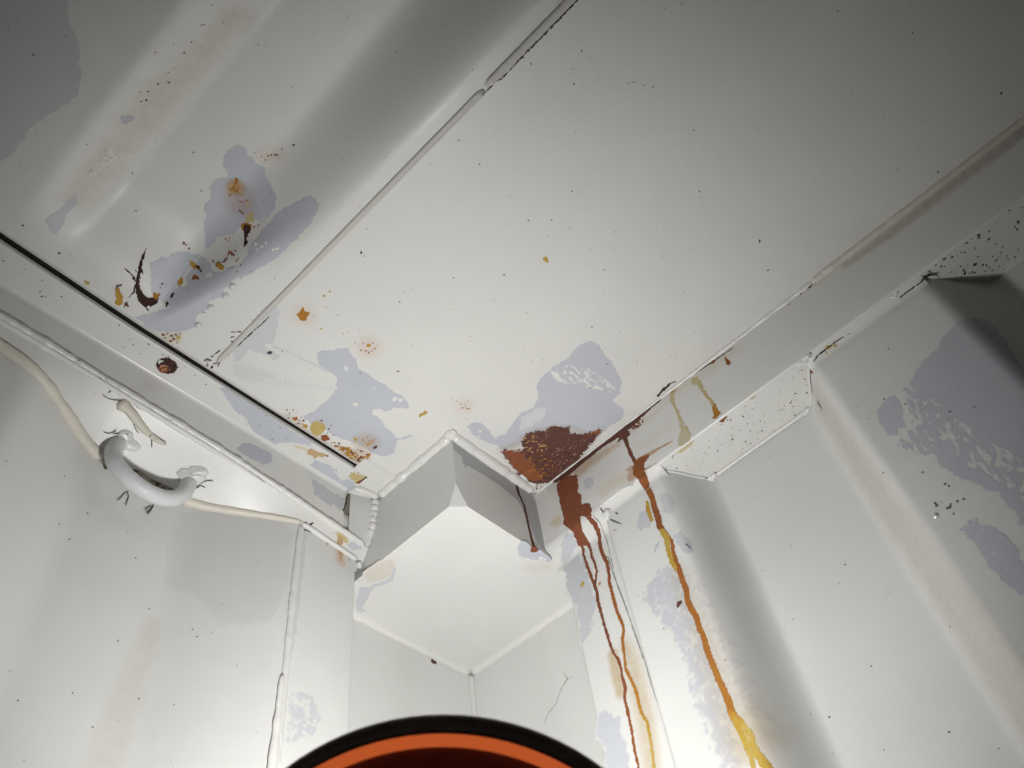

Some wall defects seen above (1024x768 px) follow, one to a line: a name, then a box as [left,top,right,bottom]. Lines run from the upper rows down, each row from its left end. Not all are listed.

peeling [0,0,82,161]
rust [115,284,129,307]
rust [177,242,202,287]
rust [212,236,241,273]
peeling [135,145,320,332]
rust [229,178,243,203]
rust [156,356,178,374]
peeling [272,346,413,457]
peeling [467,341,625,450]
peeling [876,318,1024,526]
rust [501,341,773,768]
peeling [959,518,1024,595]